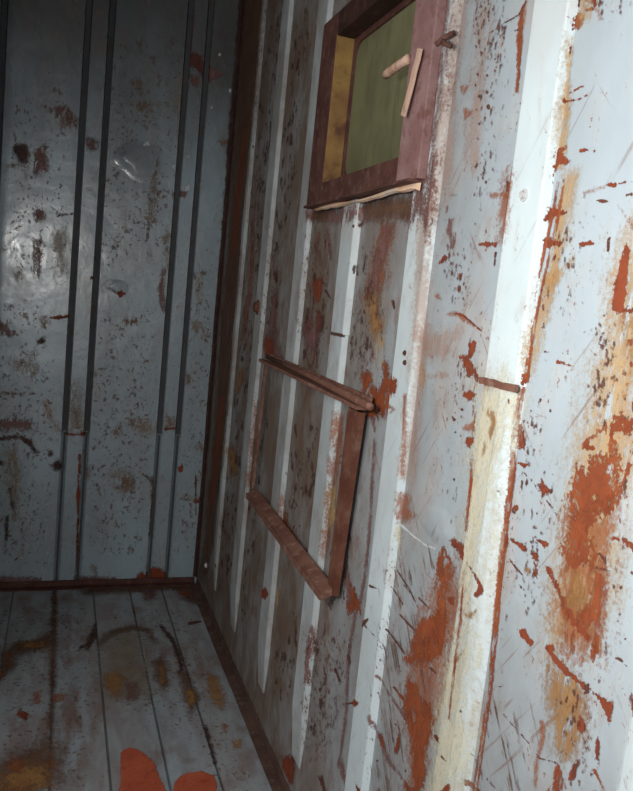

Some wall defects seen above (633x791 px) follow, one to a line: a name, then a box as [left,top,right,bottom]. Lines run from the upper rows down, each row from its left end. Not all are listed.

rust [567,0,621,31]
rust [13,144,49,176]
rust [297,0,453,475]
rust [280,422,317,534]
rust [395,492,415,522]
rust [401,0,589,791]
rust [522,245,633,667]
rust [534,665,603,791]